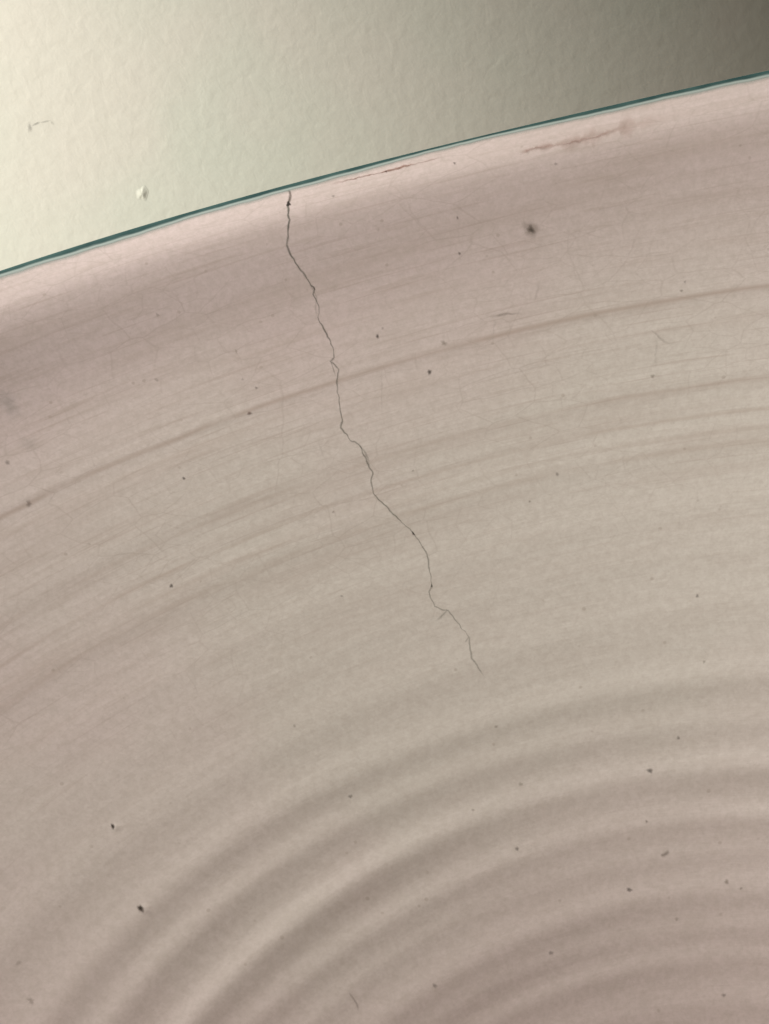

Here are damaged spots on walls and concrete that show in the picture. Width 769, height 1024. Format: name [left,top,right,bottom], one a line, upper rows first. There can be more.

crack [286,197,328,337]